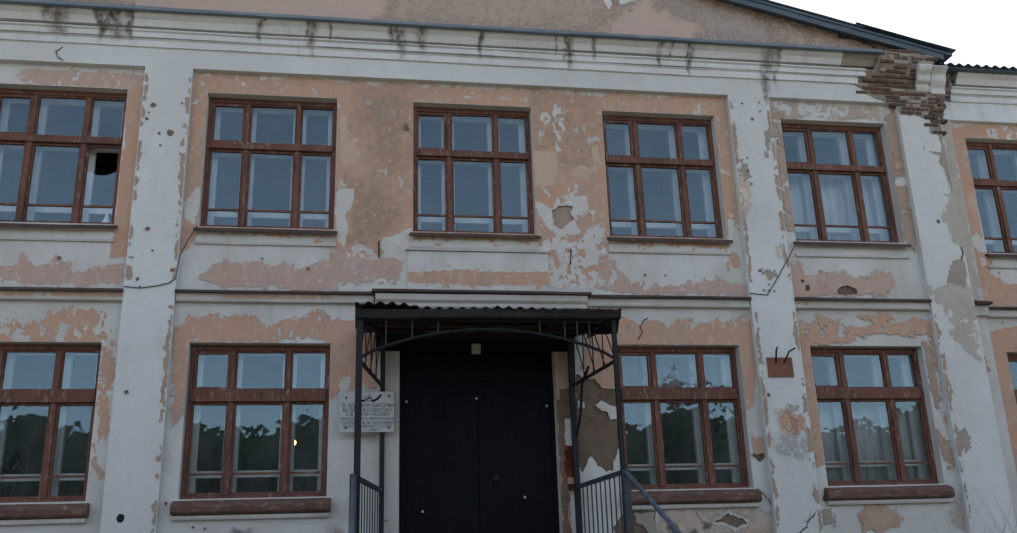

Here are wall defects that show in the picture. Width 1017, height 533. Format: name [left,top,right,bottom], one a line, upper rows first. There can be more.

peeling [0,67,156,480]
peeling [158,73,753,426]
peeling [559,312,764,533]
peeling [859,504,905,533]
flaking render [751,34,1017,532]